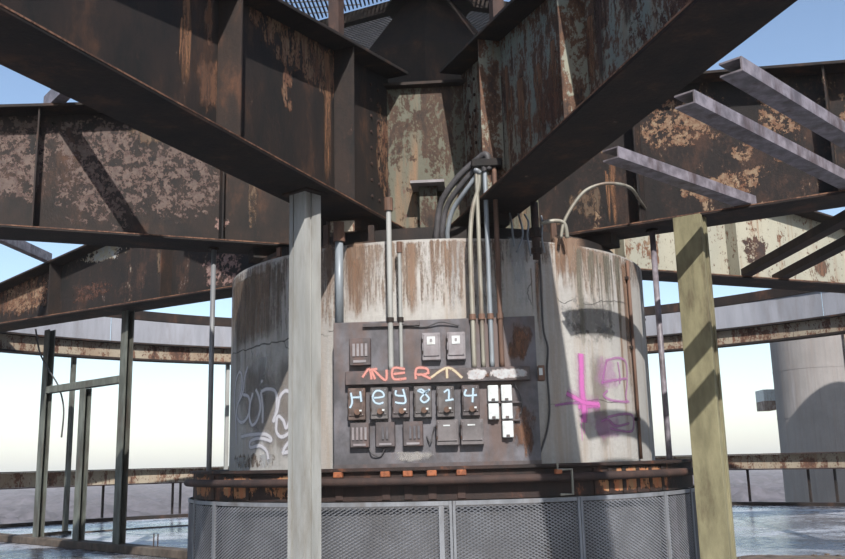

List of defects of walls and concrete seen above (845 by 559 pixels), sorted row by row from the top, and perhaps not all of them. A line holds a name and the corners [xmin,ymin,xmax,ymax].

rust [586,0,647,91]
rust [312,43,331,175]
rust [501,38,563,154]
rust [0,272,49,317]
water stain [234,264,282,348]
water stain [405,244,417,306]
water stain [577,250,621,330]
crack [235,338,289,359]
rust [508,323,533,361]
rust [222,475,288,499]
rust [599,466,668,491]